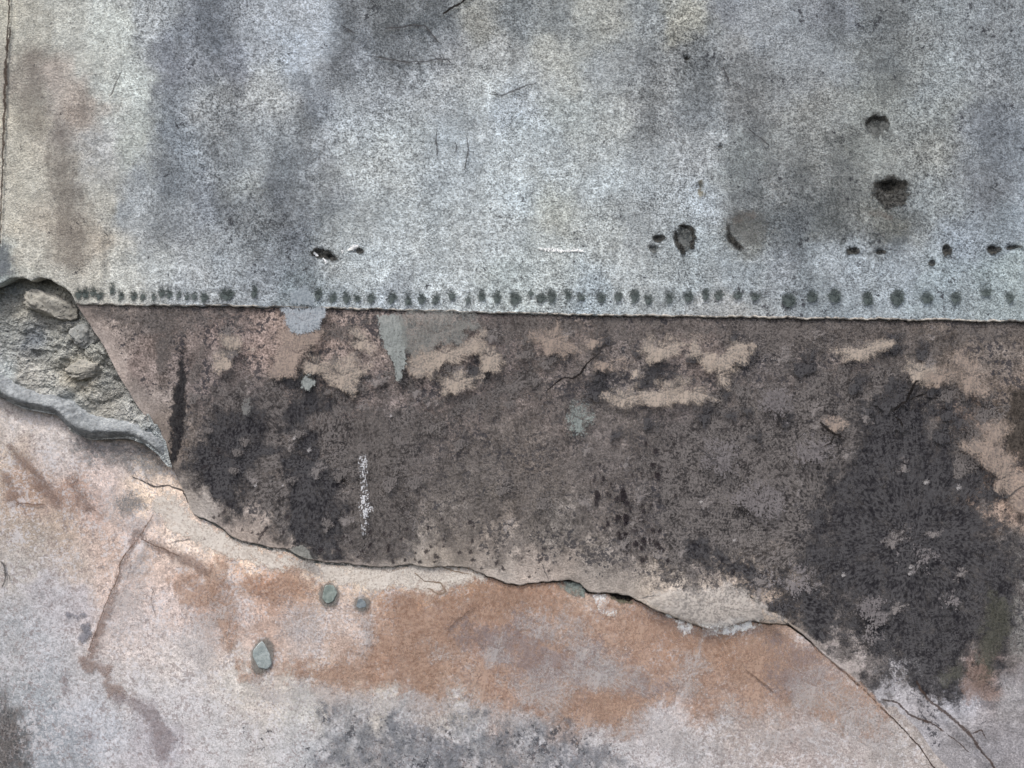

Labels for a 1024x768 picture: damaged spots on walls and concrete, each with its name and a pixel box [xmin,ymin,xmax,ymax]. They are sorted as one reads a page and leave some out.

spalling [863,112,890,138]
spalling [648,222,697,255]
spalling [726,225,743,249]
spalling [928,244,952,266]
spalling [987,245,1023,255]
spalling [0,279,172,468]
leakage [69,319,570,564]
rust [166,555,262,682]
crack [88,477,548,650]
crack [582,587,702,629]
leakage [582,320,1024,708]
crack [739,590,995,768]